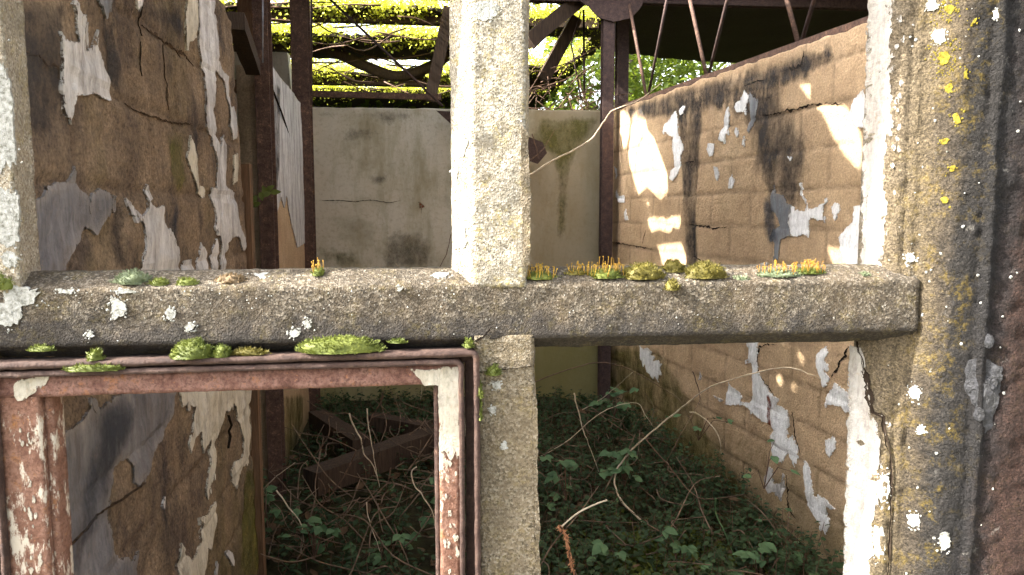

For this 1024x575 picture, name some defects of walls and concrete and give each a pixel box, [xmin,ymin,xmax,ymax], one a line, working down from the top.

crack [124,6,194,125]
flaking render [36,0,247,271]
damp [539,120,588,168]
flaking render [662,106,685,181]
damp [626,47,831,265]
flaking render [707,91,758,189]
flaking render [639,345,662,382]
spalling [964,334,1003,433]
flaking render [65,390,251,575]
peeling [713,342,891,575]
crack [831,341,893,575]